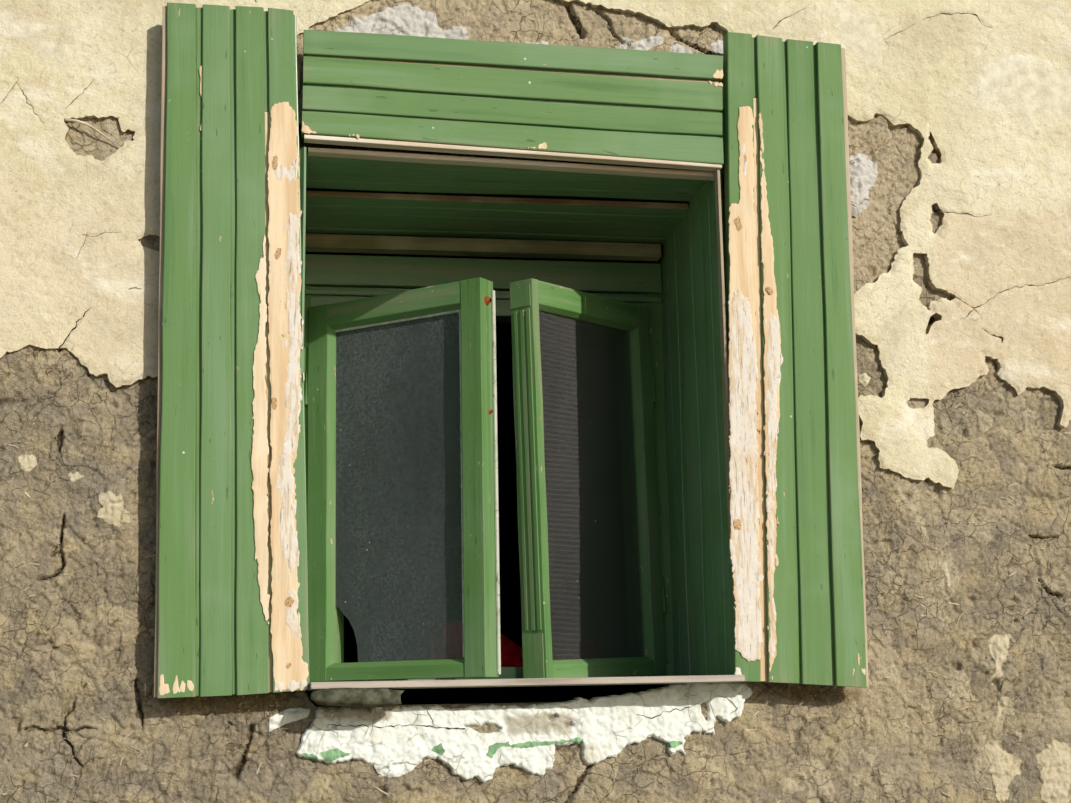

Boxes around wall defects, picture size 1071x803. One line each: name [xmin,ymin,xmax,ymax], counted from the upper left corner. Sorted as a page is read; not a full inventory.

spalling [297,0,725,89]
spalling [65,117,135,161]
spalling [848,115,952,307]
crack [950,277,1069,343]
peeling [251,235,270,624]
peeling [267,102,309,692]
peeling [728,106,783,672]
crack [43,518,65,580]
spalling [0,336,1071,803]
crack [28,699,95,765]
crack [235,728,253,775]
crack [571,766,589,803]